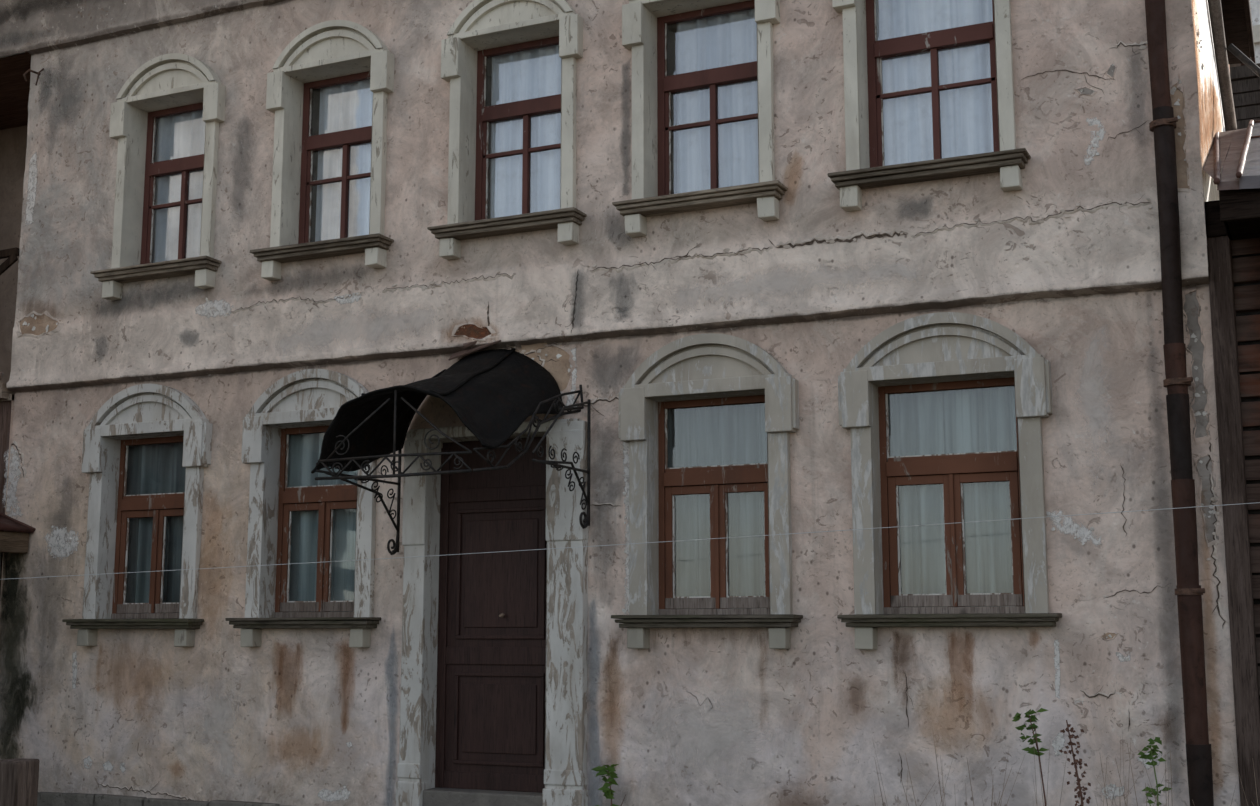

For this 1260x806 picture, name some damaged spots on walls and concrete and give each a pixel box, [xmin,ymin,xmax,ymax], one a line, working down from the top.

crack [571,198,1152,332]
spalling [16,310,63,339]
crack [224,271,559,367]
spalling [449,322,578,406]
peeling [1046,511,1102,545]
crack [1206,440,1227,627]